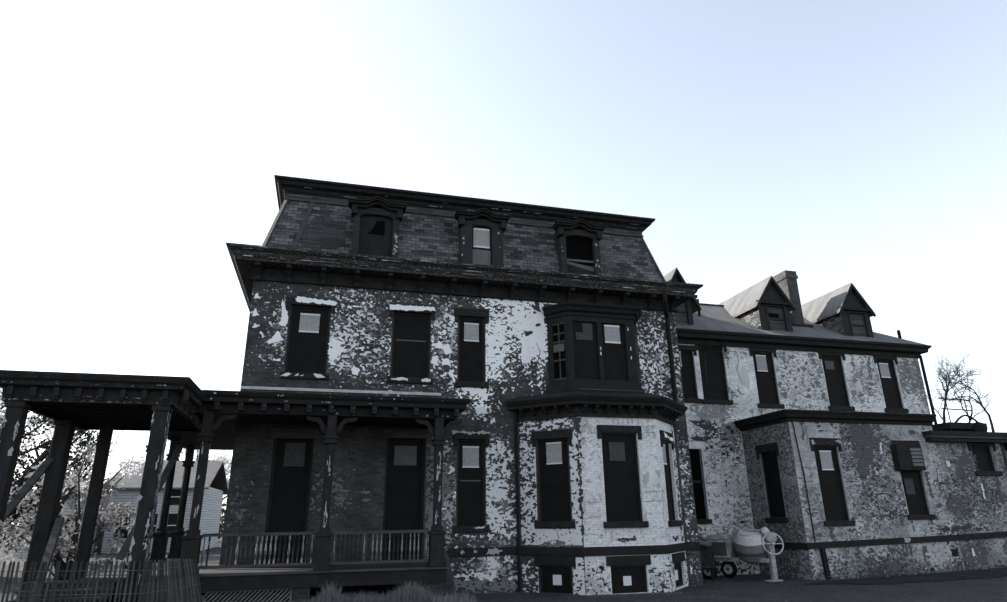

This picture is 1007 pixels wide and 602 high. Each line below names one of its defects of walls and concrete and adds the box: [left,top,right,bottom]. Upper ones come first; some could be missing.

peeling [245,284,292,379]
peeling [636,311,683,403]
peeling [776,355,836,411]
peeling [850,364,881,407]
peeling [896,359,927,413]
peeling [308,287,552,593]
peeling [562,417,599,544]
peeling [643,387,1007,593]
spalling [574,557,611,595]